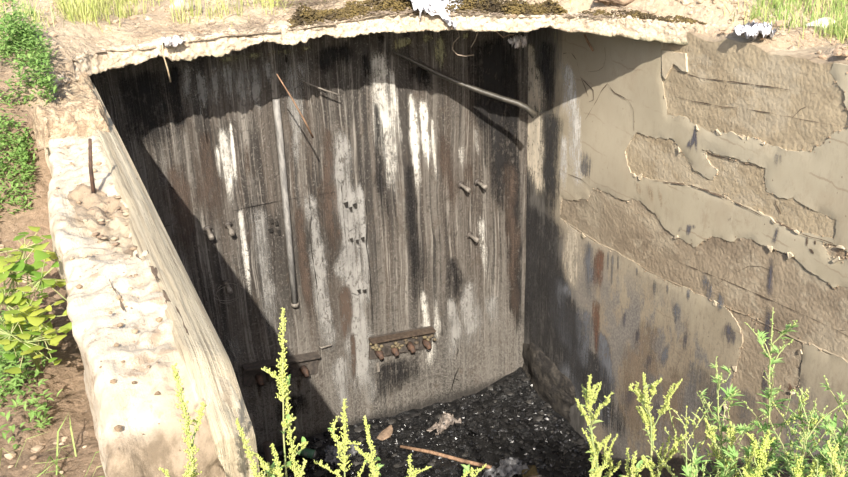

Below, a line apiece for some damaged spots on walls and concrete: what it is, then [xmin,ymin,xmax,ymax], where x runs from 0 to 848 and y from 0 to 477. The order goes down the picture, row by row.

damp [215,124,236,193]
damp [238,209,275,324]
spalling [276,74,314,138]
damp [305,131,420,407]
damp [317,43,438,327]
damp [463,33,723,437]
corrosion [592,301,600,351]
crack [563,53,634,118]
corrosion [593,248,604,282]
flaking render [560,188,848,461]
flaking render [625,132,848,263]
flaking render [660,32,848,153]